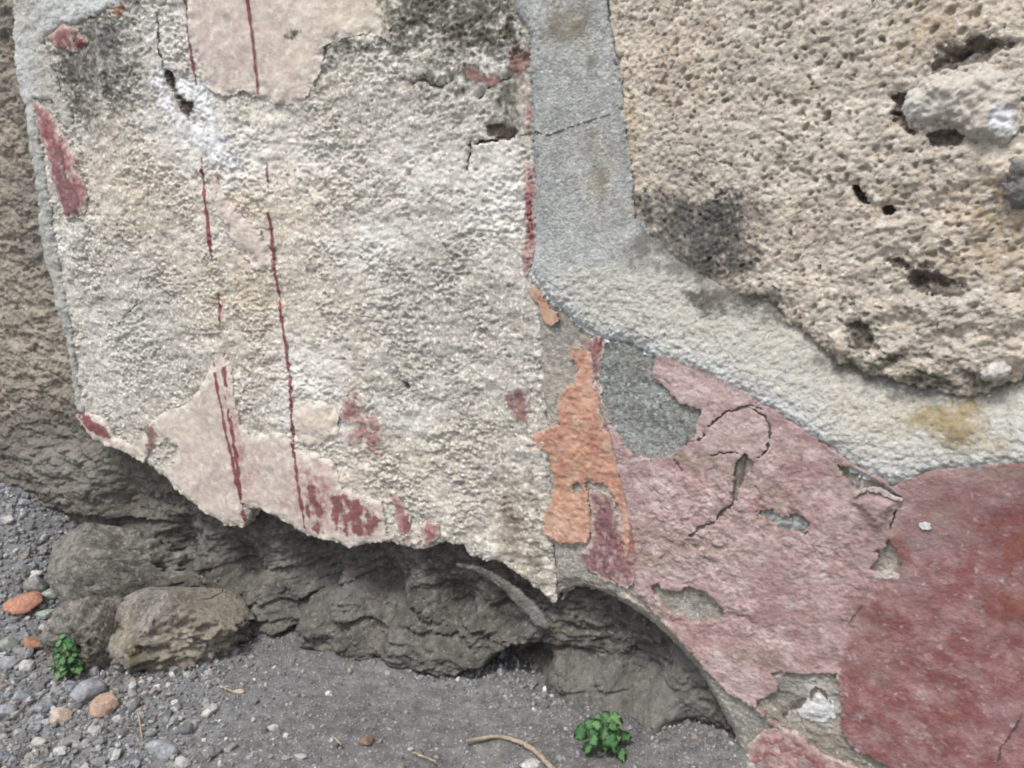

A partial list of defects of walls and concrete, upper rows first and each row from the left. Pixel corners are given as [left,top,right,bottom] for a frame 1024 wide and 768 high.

crack [466,113,610,170]
peeling [506,389,530,423]
peeling [75,354,441,548]
peeling [532,332,702,617]
crack [674,404,772,537]
flaking render [839,465,902,497]
flaking render [760,509,810,534]
peeling [456,563,550,629]
flaking render [653,583,724,621]
flaking render [758,671,887,768]